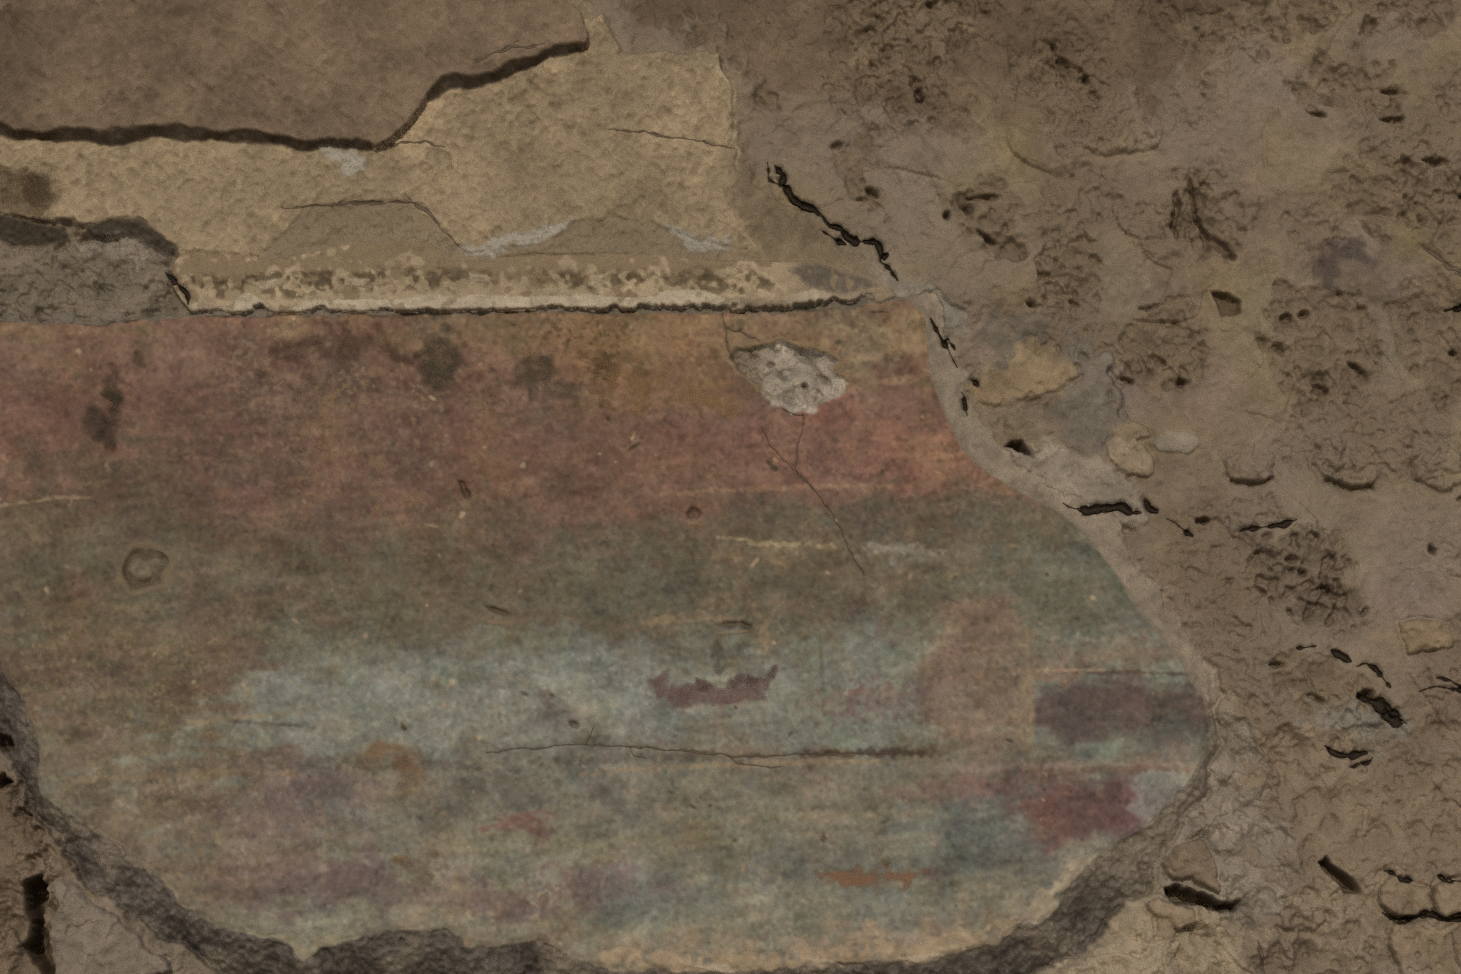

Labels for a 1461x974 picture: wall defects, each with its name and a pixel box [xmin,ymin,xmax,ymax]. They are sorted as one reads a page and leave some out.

crack [382,139,445,147]
crack [608,129,898,281]
spalling [724,335,854,414]
crack [486,726,895,768]